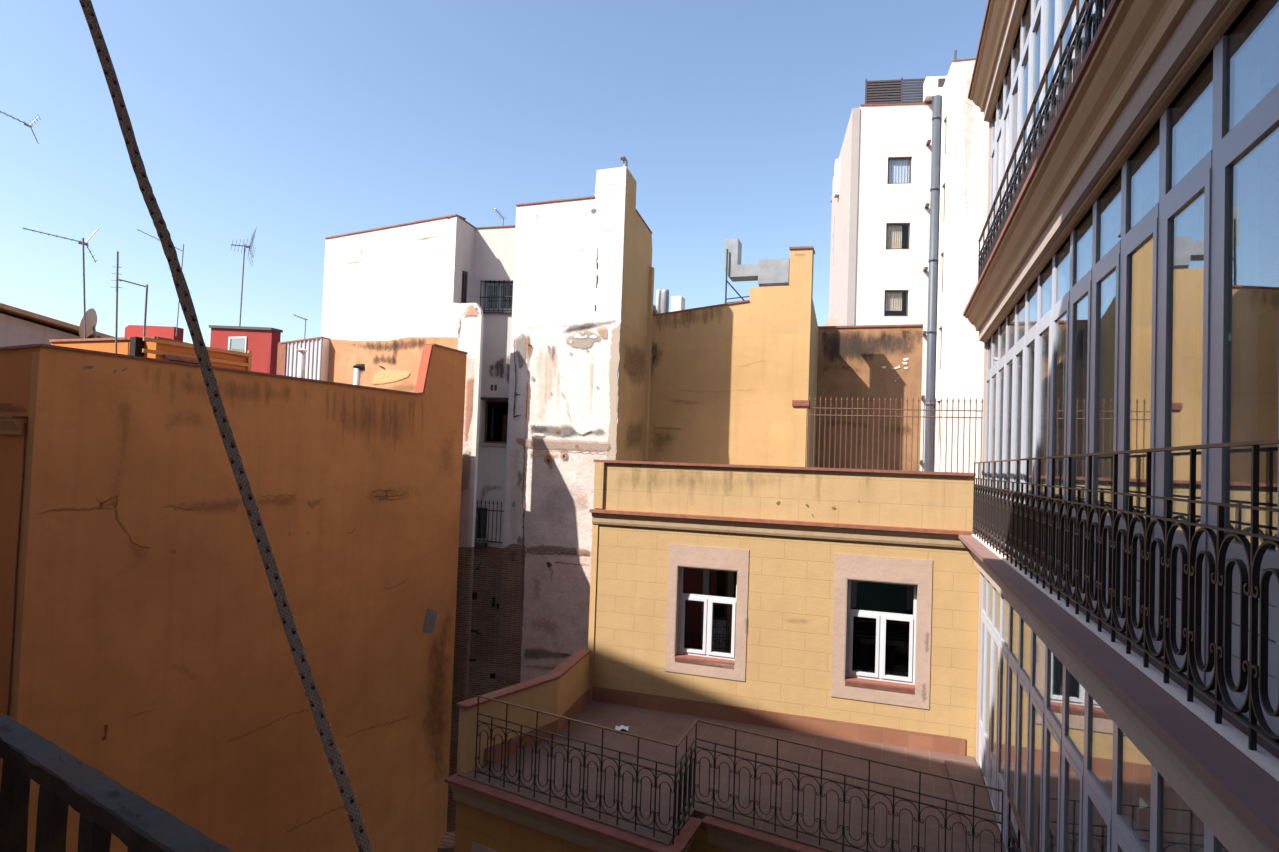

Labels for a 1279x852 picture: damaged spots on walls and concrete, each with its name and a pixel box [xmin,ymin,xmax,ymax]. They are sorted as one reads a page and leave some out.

flaking render [446,319,621,832]
water stain [828,336,910,382]